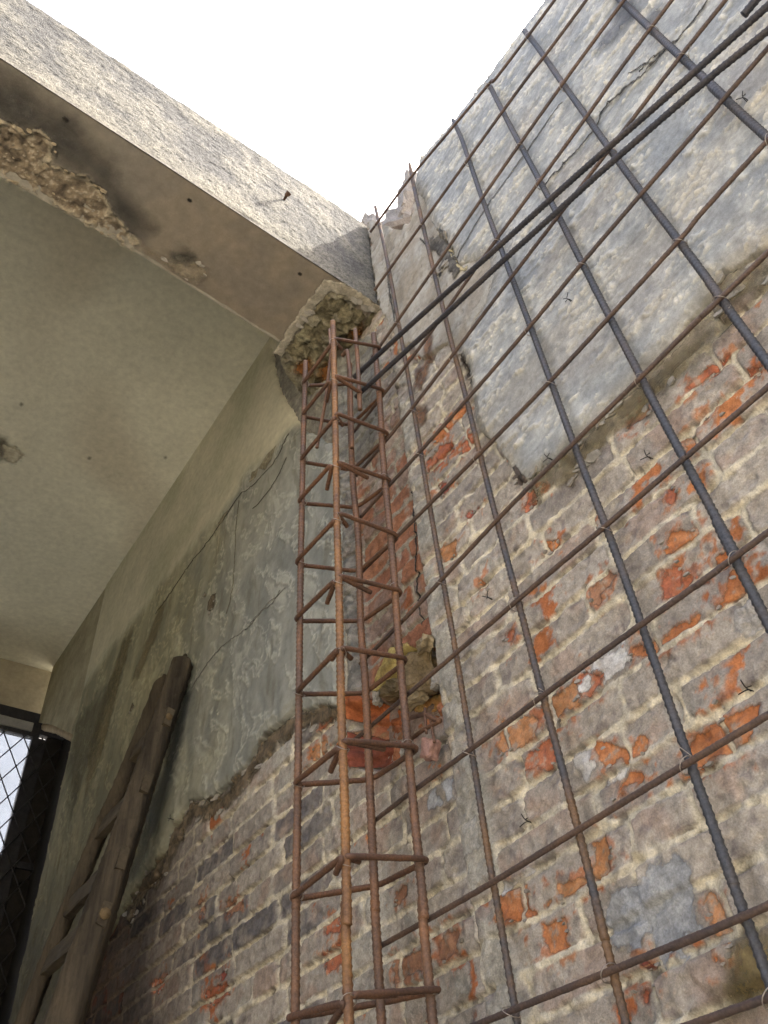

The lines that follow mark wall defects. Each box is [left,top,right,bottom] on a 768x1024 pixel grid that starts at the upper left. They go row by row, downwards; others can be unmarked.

leakage [0,82,143,230]
spalling [0,119,207,283]
crack [545,0,708,185]
spalling [273,279,380,397]
peeling [0,438,24,463]
crack [155,433,289,688]
crack [411,491,425,625]
spalling [345,0,768,1024]
spalling [122,704,338,927]
spalling [205,968,231,1008]
spalling [323,917,342,973]